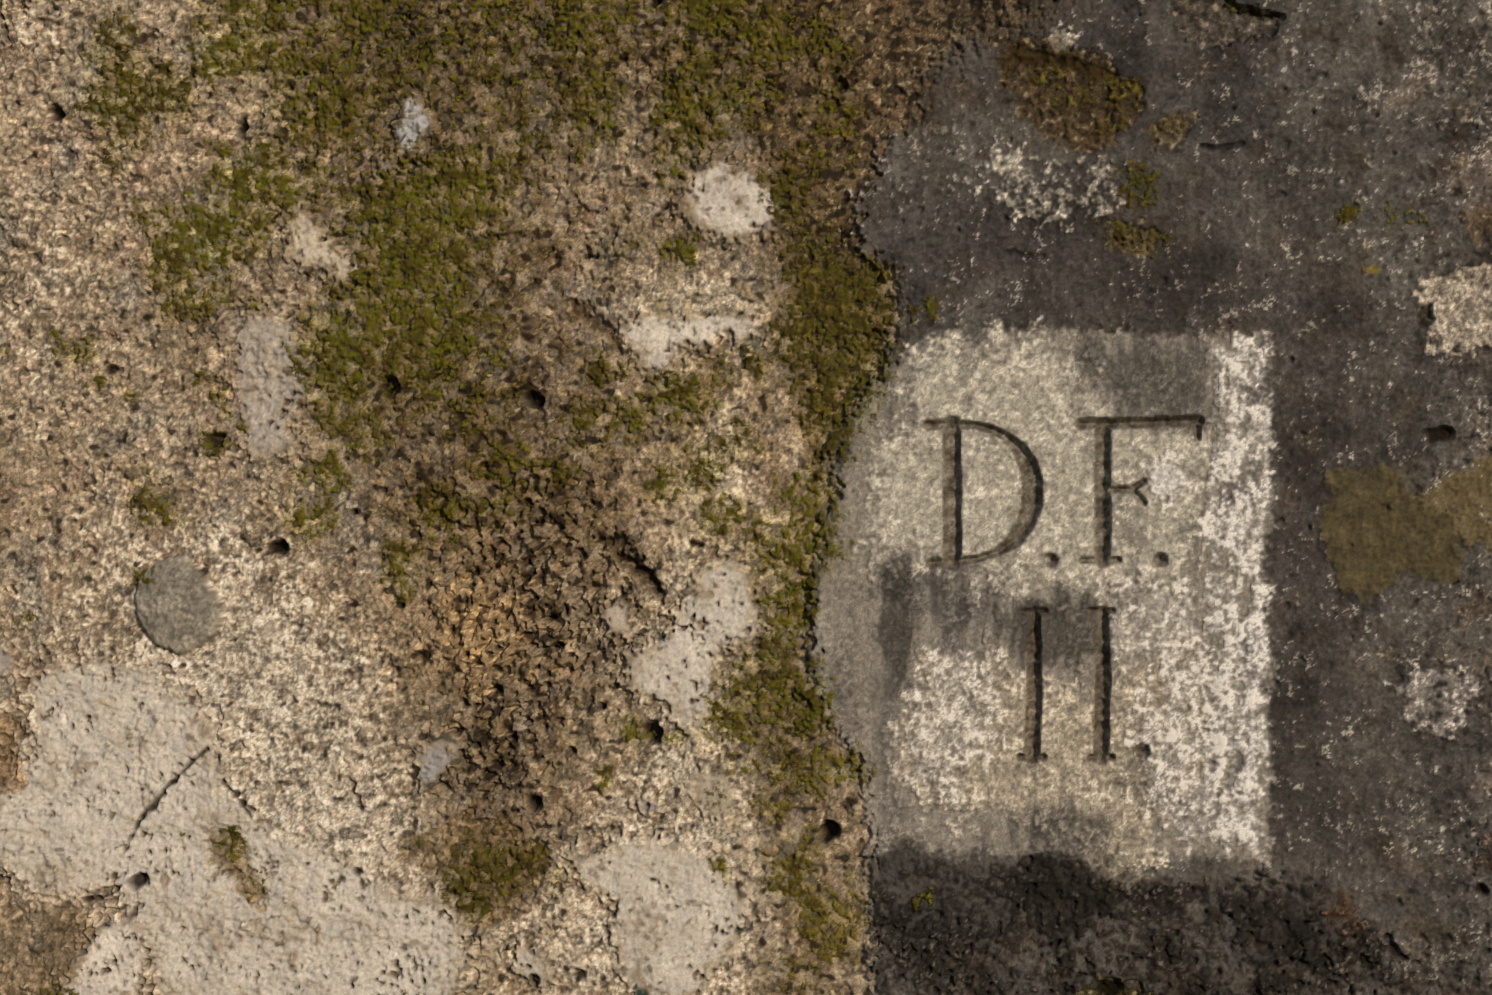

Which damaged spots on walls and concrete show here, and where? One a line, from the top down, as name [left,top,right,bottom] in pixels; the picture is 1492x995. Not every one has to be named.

crack [82,747,258,903]